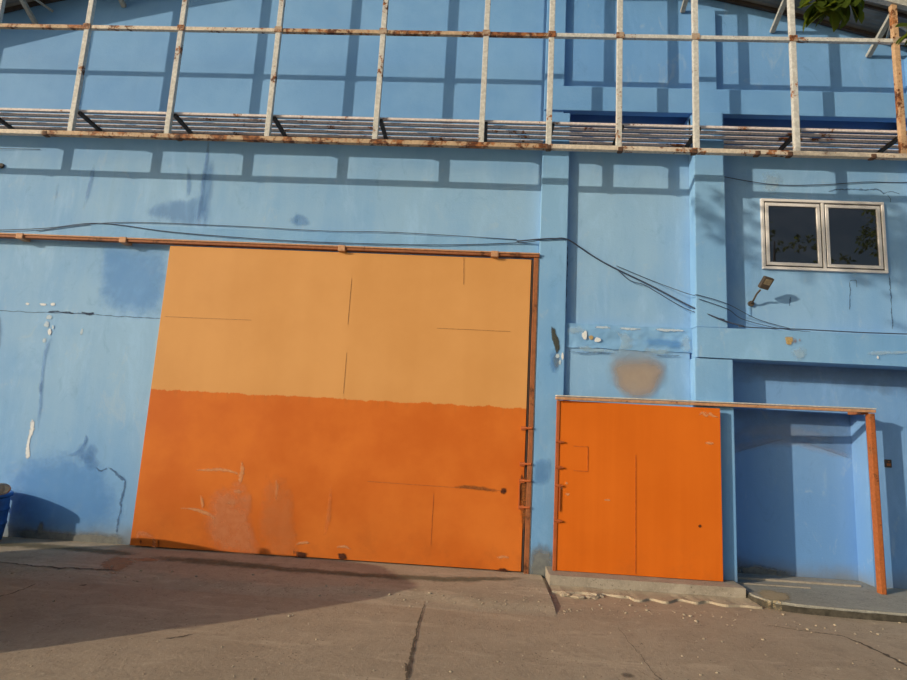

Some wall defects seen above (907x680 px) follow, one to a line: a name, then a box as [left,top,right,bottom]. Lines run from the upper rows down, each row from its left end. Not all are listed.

flaking render [551,327,564,367]
water stain [25,420,34,458]
water stain [20,523,120,544]
crack [772,625,907,666]